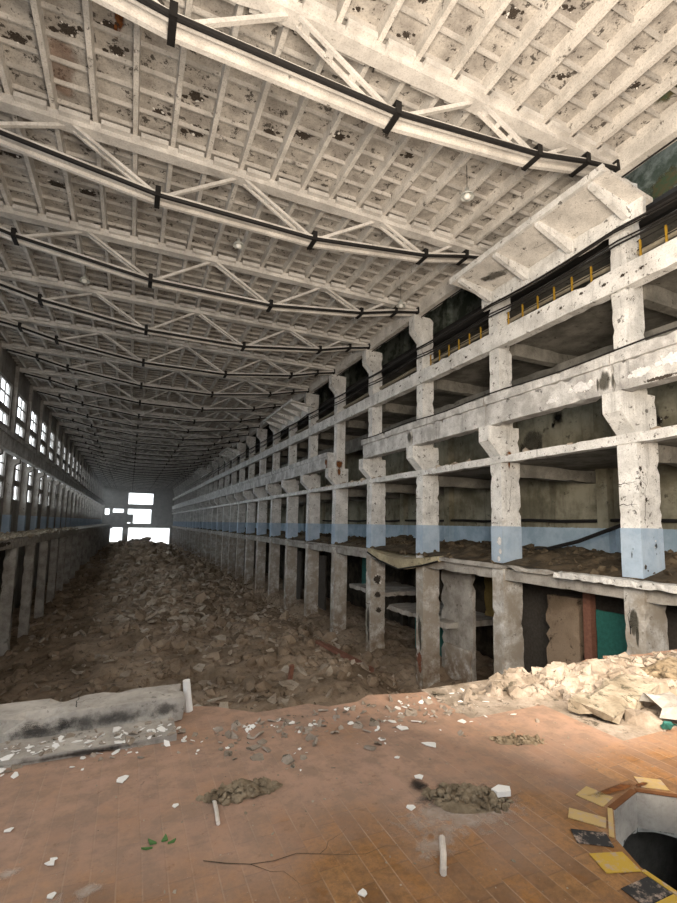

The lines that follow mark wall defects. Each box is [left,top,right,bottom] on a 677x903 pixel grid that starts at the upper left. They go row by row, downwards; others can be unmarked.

peeling [501,6,524,19]
corrosion [113,12,124,31]
peeling [48,21,84,38]
peeling [1,30,32,45]
peeling [102,45,129,57]
peeling [182,90,209,102]
peeling [180,124,209,138]